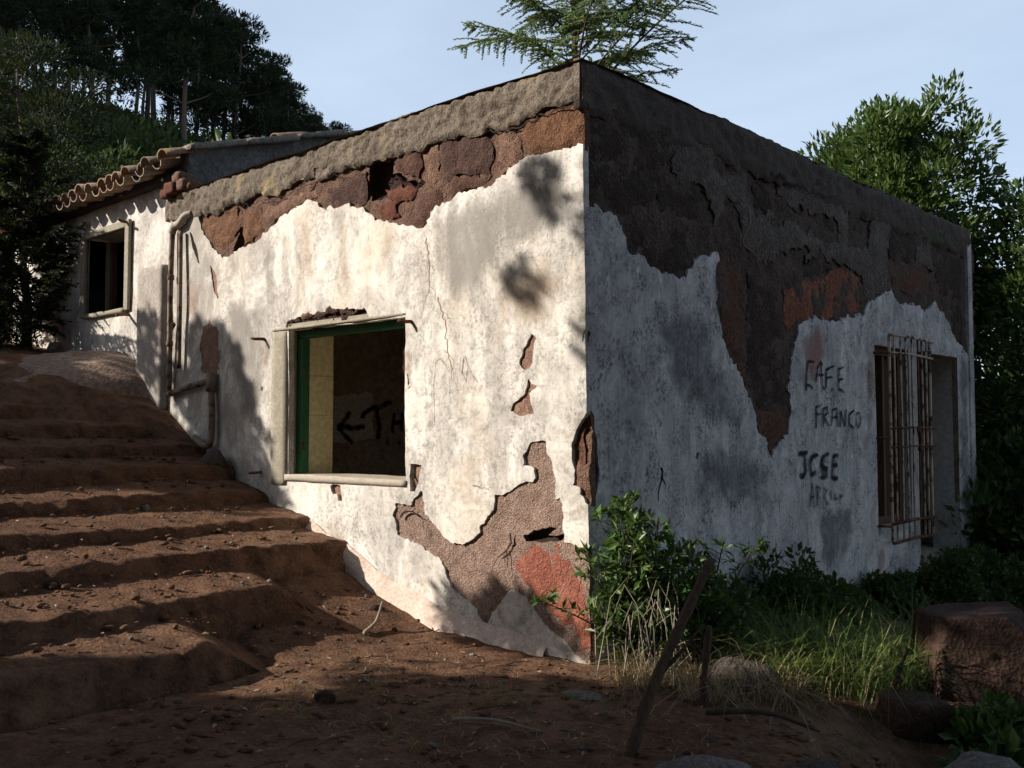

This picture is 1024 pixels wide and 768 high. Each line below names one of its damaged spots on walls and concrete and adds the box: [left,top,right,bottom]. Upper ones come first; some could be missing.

crack [422,240,455,418]
peeling [200,102,975,455]
flaking render [394,441,595,665]
spalling [574,410,597,506]